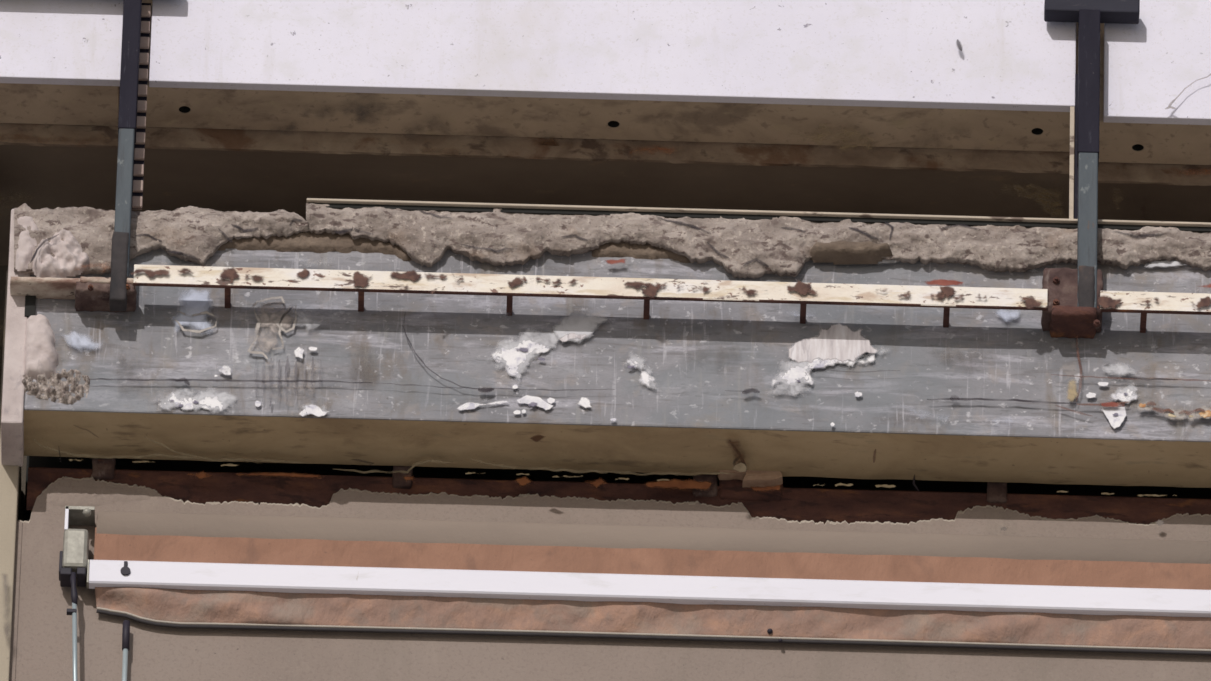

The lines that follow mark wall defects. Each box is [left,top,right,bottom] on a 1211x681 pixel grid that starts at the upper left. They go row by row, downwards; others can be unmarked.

spalling [14,203,115,278]
spalling [129,203,1078,279]
spalling [1097,226,1211,271]
corrosion [131,268,192,277]
corrosion [220,267,263,283]
corrosion [390,270,463,294]
corrosion [508,277,577,287]
corrosion [624,281,710,298]
corrosion [926,279,987,300]
peeling [159,366,236,412]
peeling [457,328,559,414]
peeling [772,323,884,395]